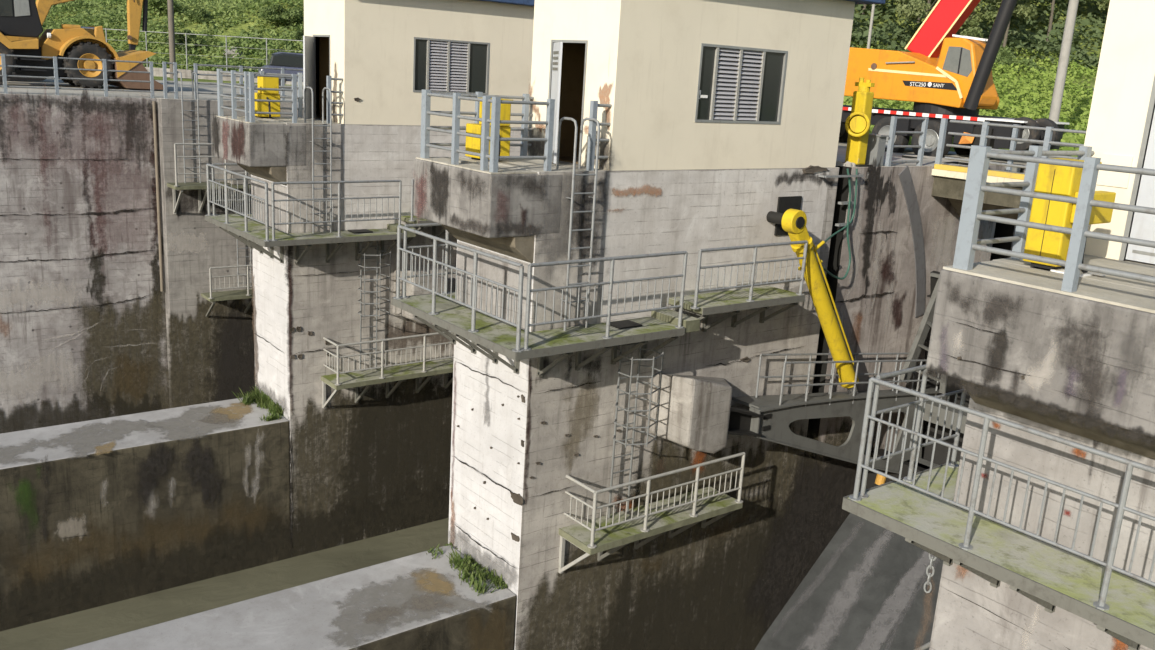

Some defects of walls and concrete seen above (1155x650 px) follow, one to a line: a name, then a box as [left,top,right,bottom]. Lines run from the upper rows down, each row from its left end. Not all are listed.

peeling [599,84,612,129]
spalling [612,185,662,211]
damp [862,156,896,295]
damp [949,289,970,308]
damp [0,160,255,506]
damp [387,319,454,351]
crack [457,362,600,394]
damp [923,296,1155,445]
crack [454,456,573,498]
damp [0,373,453,631]
damp [518,422,869,650]